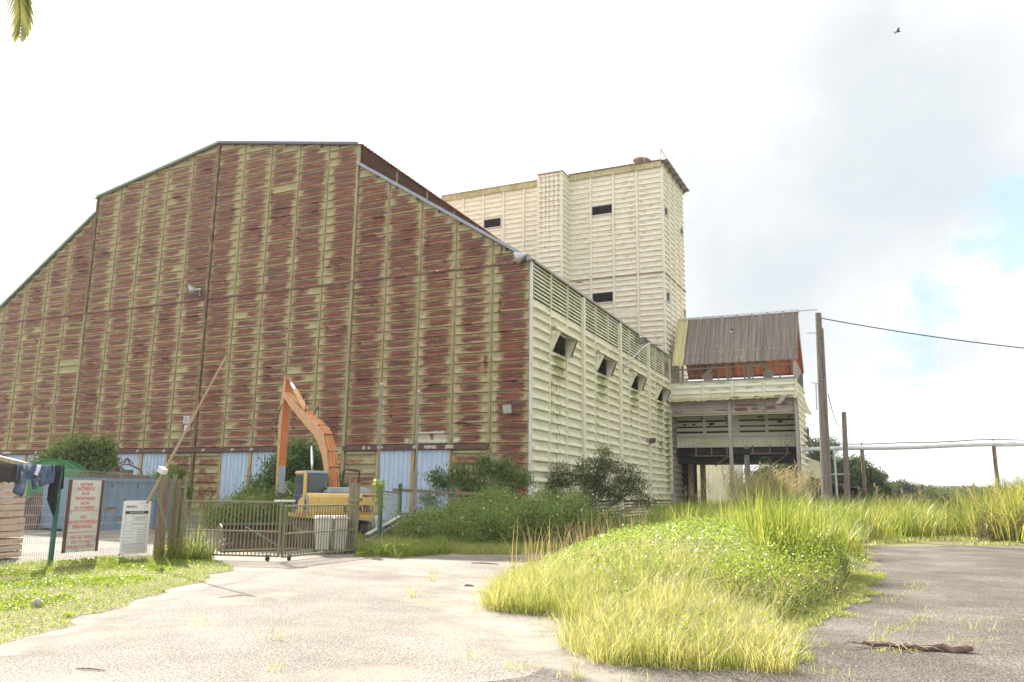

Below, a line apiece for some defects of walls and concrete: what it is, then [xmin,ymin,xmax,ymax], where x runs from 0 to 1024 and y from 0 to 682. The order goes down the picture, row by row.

rust [0,148,529,508]